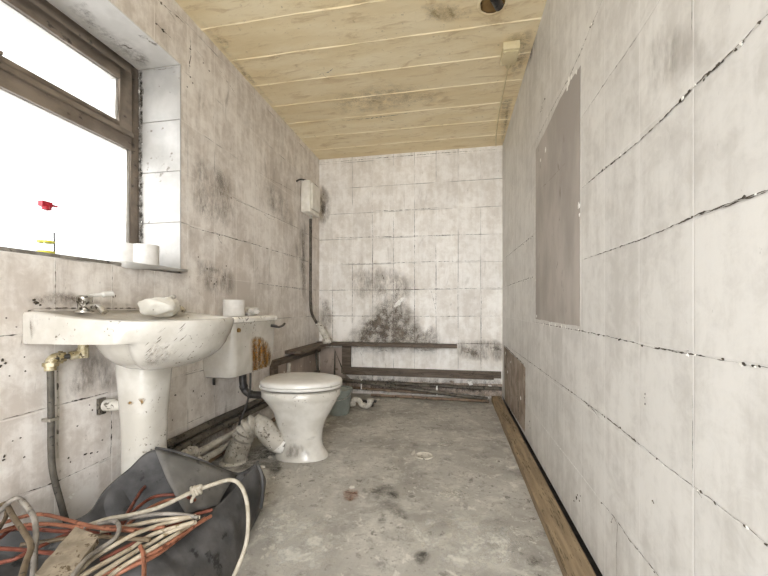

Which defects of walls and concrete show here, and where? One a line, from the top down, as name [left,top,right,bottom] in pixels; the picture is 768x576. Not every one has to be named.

crack [585,14,768,185]
flaking render [535,66,581,329]
crack [586,190,768,259]
flaking render [278,347,398,389]
peeling [408,345,530,432]
crack [541,323,767,368]
crack [512,349,768,547]
crack [601,503,658,575]